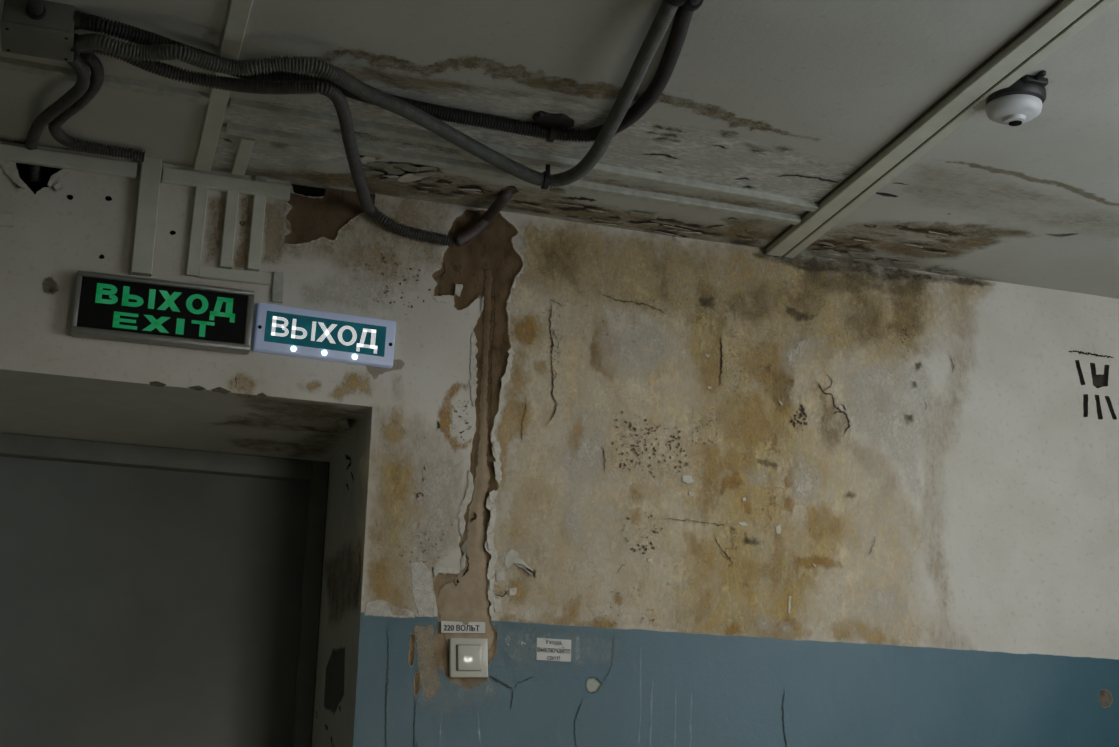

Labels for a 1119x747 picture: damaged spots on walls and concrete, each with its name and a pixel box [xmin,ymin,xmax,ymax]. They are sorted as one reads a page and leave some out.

damp [306,50,621,171]
flaking render [0,163,71,194]
flaking render [360,155,446,182]
damp [949,162,1118,205]
flaking render [284,184,376,244]
damp [217,94,1024,646]
flaking render [408,209,526,709]
crack [780,693,788,747]